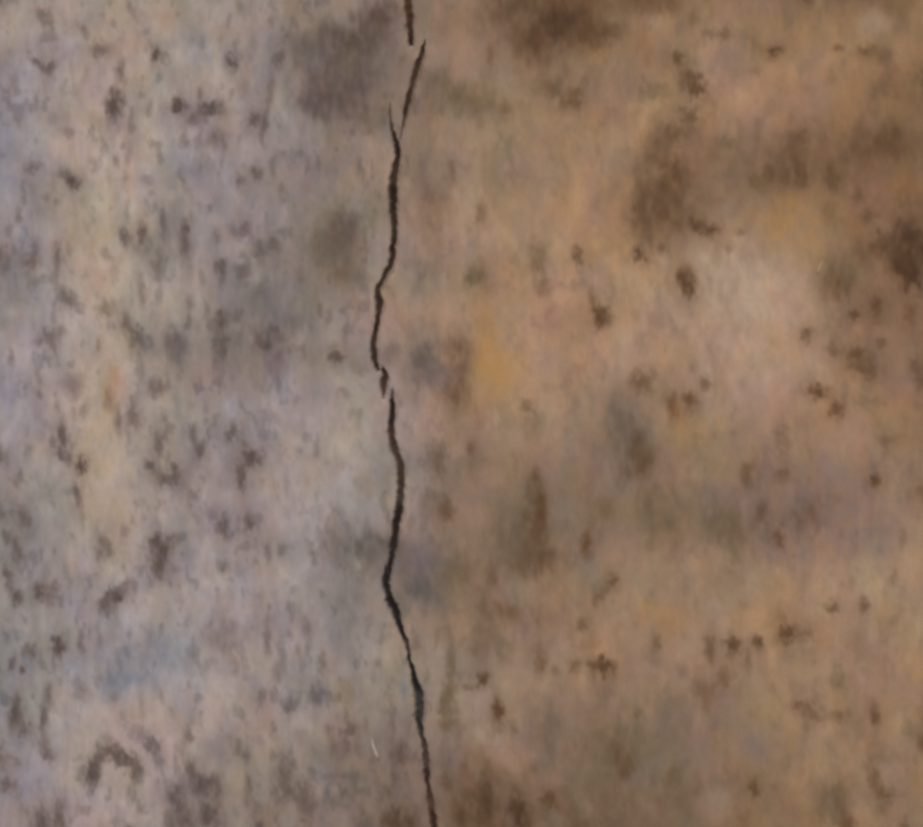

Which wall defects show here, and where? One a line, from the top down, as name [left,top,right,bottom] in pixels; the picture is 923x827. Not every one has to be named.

crack [368,0,439,827]